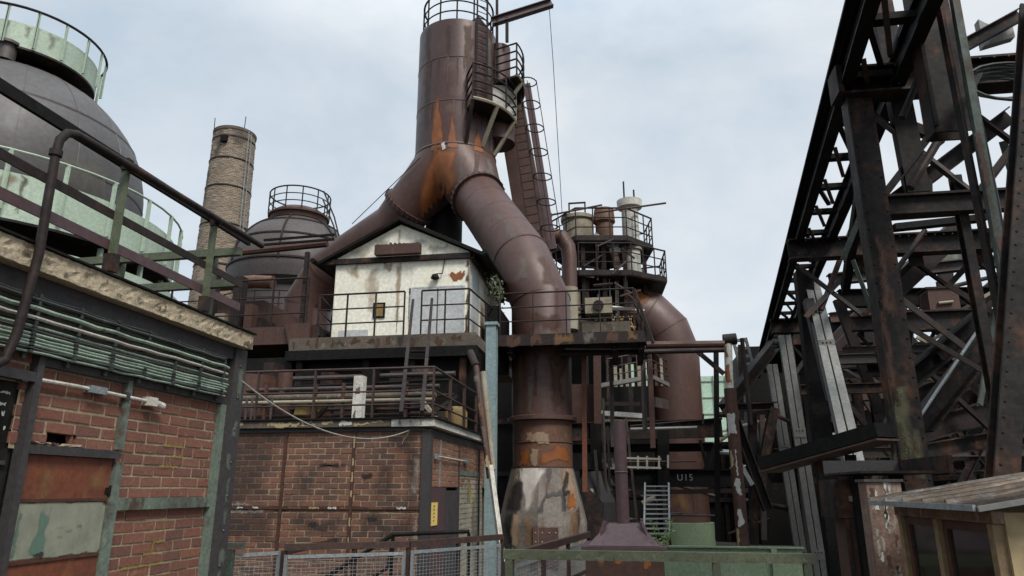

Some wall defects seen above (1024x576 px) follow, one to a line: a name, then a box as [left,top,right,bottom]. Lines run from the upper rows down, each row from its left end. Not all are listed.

corrosion [420,95,458,218]
peeling [448,271,465,281]
peeling [727,413,737,435]
corrosion [515,430,569,466]
peeling [730,450,742,495]
peeling [9,502,105,561]
peeling [736,509,745,546]
peeling [870,482,902,576]